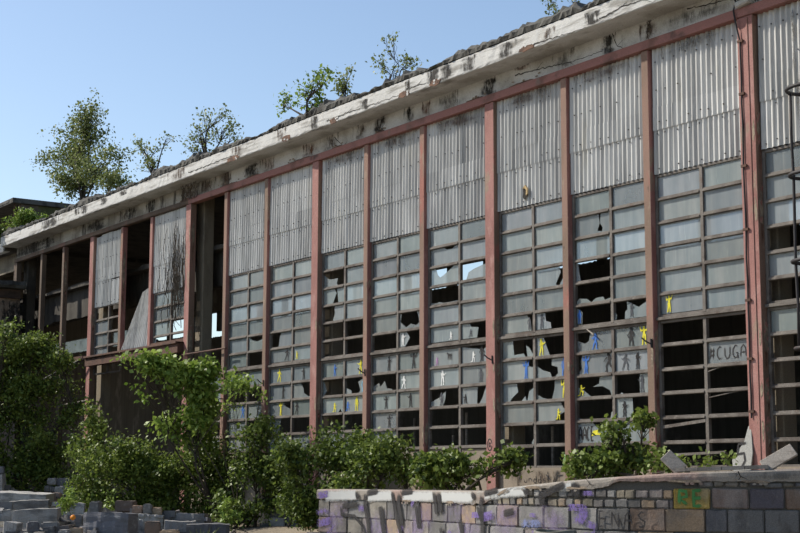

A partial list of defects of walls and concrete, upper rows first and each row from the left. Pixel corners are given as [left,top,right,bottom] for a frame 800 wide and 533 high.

crack [515,0,654,76]
damp [602,32,616,54]
damp [427,66,451,82]
damp [481,78,496,95]